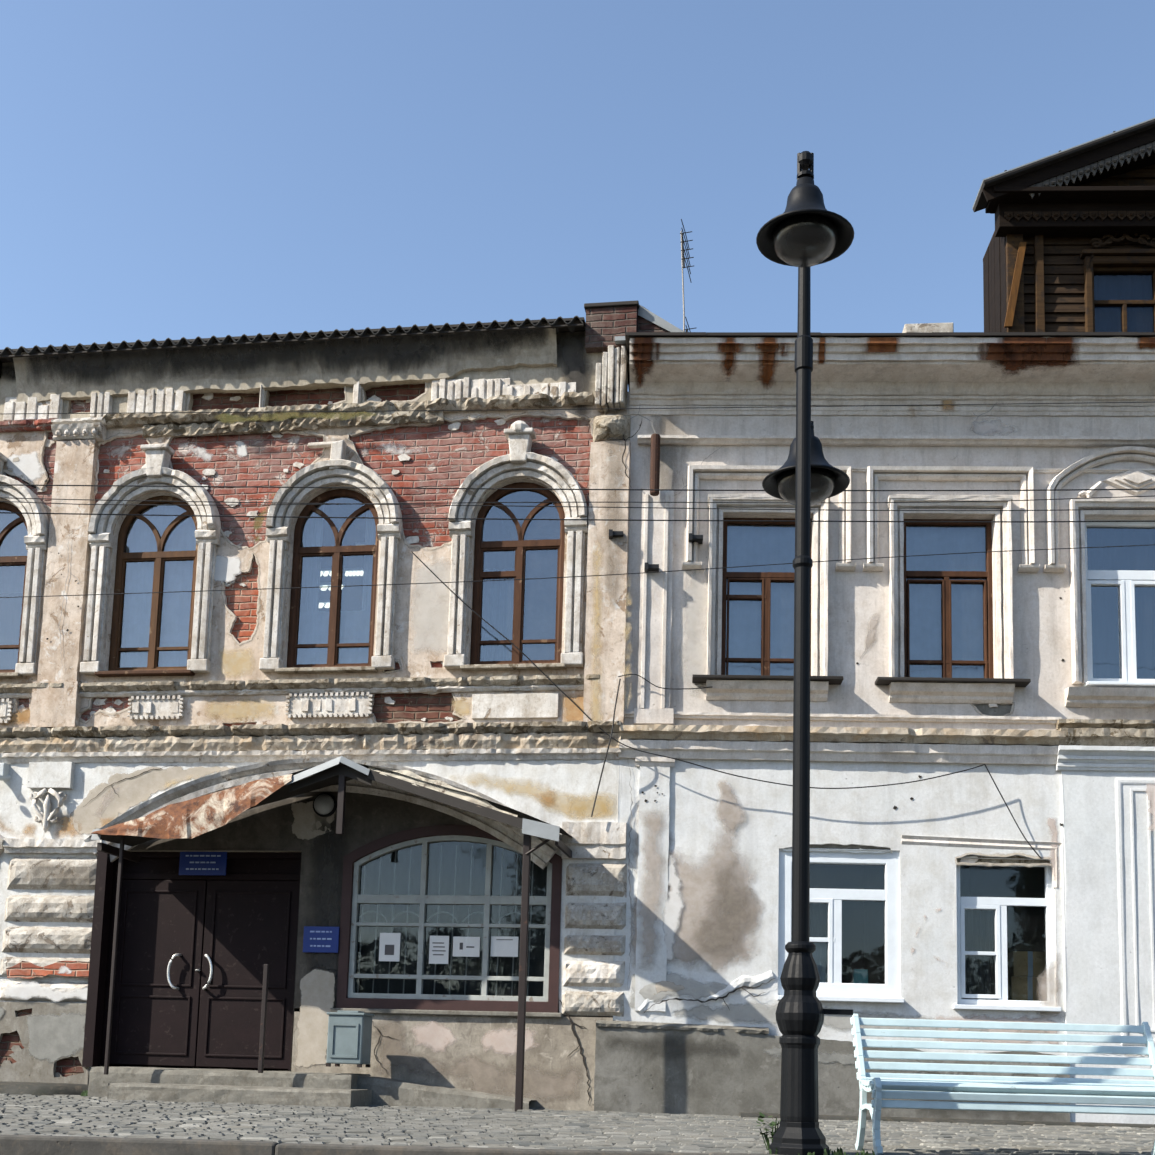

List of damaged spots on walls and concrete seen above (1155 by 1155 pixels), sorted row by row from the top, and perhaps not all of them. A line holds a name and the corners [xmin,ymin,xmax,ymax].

spalling [186,387,346,411]
spalling [362,382,427,403]
rust [632,338,660,386]
rust [718,337,787,385]
rust [979,337,1076,374]
spalling [2,430,56,509]
spalling [93,430,150,510]
spalling [347,412,596,550]
spalling [165,424,326,675]
crack [83,765,177,807]
leakage [632,782,760,969]
spalling [0,961,90,1077]